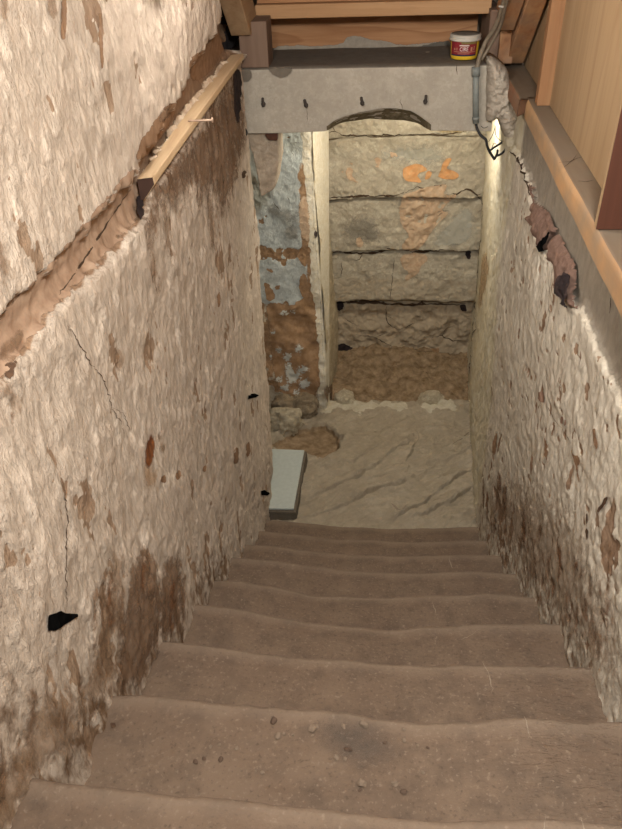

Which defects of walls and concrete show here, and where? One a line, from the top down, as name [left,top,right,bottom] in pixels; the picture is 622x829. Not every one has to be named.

flaking render [189,24,227,81]
flaking render [0,103,177,379]
peeling [263,196,320,397]
flaking render [524,176,578,309]
water stain [482,476,506,547]
water stain [0,551,186,829]